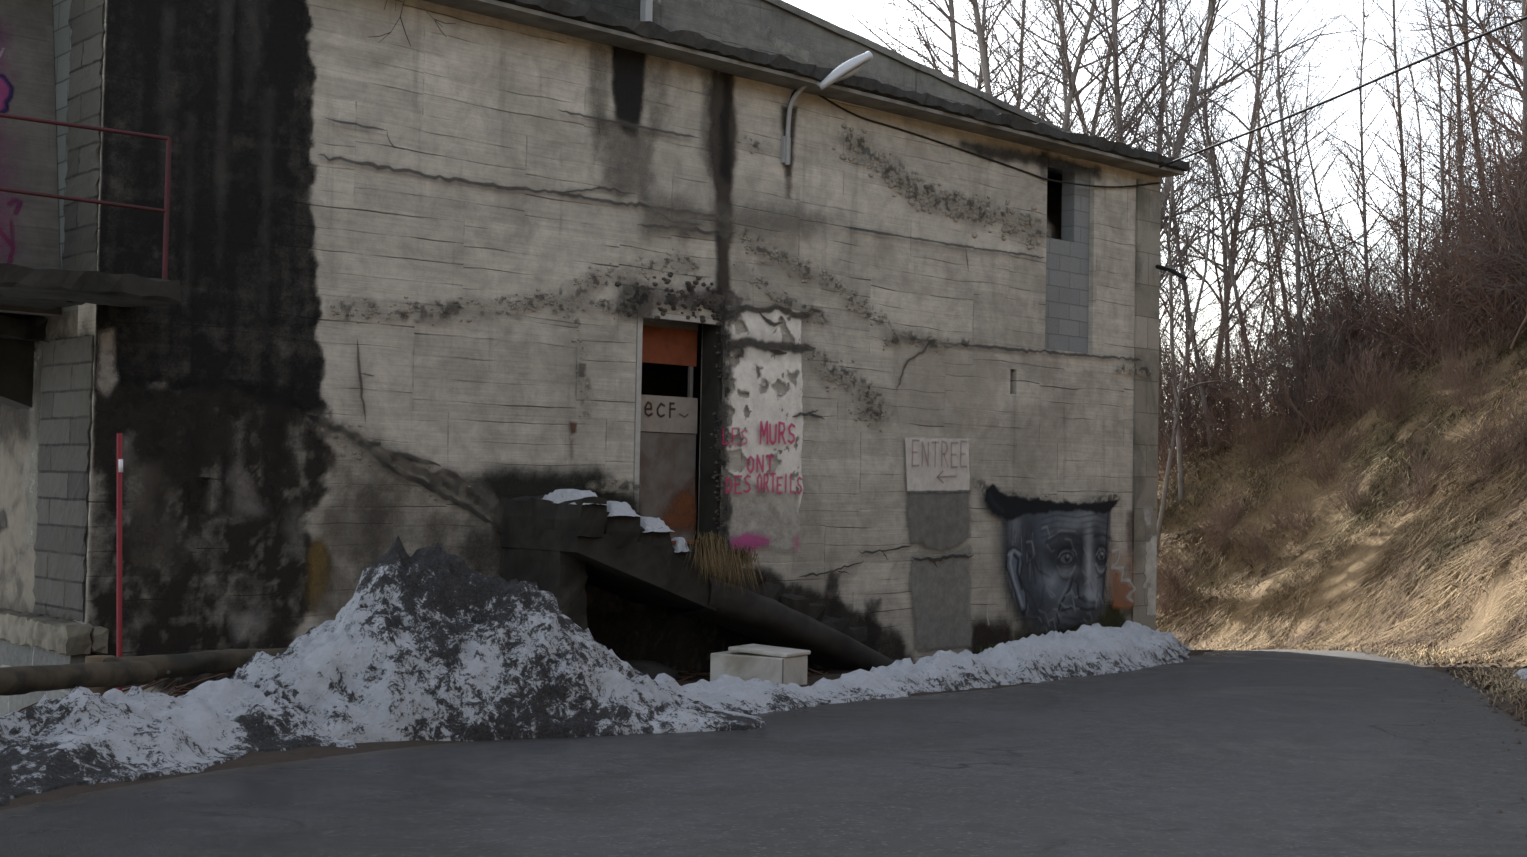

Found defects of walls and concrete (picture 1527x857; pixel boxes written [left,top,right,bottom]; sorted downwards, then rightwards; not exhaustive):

crack [318,118,737,236]
crack [557,109,698,138]
water stain [594,46,825,317]
water stain [0,0,412,657]
peeling [330,228,950,555]
water stain [154,672,235,694]